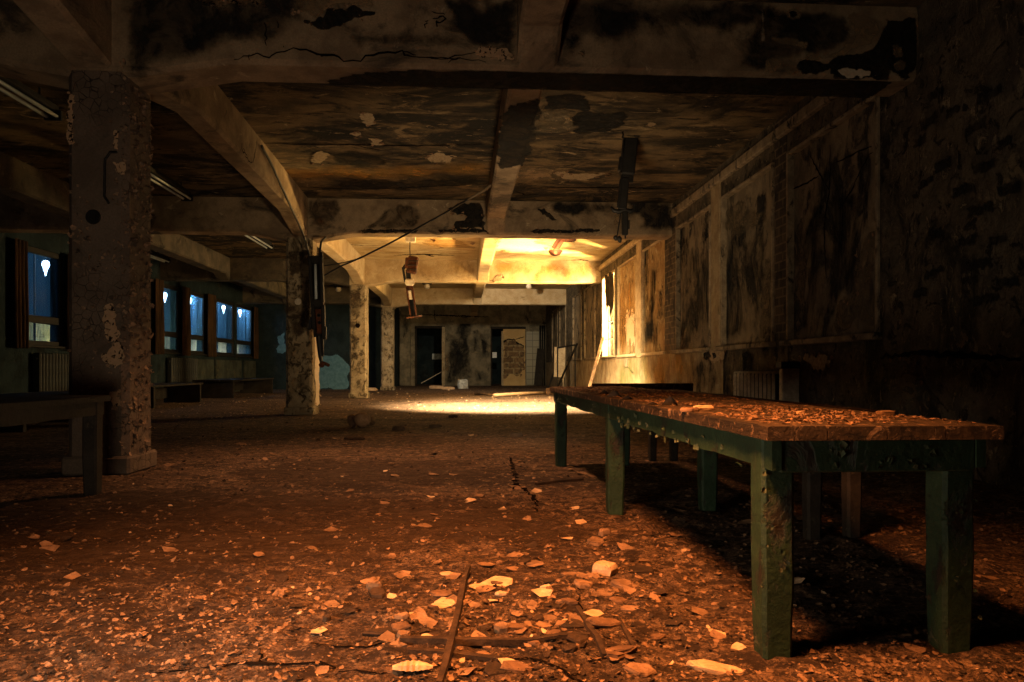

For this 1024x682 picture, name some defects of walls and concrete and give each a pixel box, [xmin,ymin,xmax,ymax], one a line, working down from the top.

crack [234,21,485,63]
spalling [328,17,918,181]
peeling [310,151,330,166]
peeling [66,59,155,457]
leakage [726,194,766,339]
spalling [503,339,525,379]
crack [509,457,539,511]